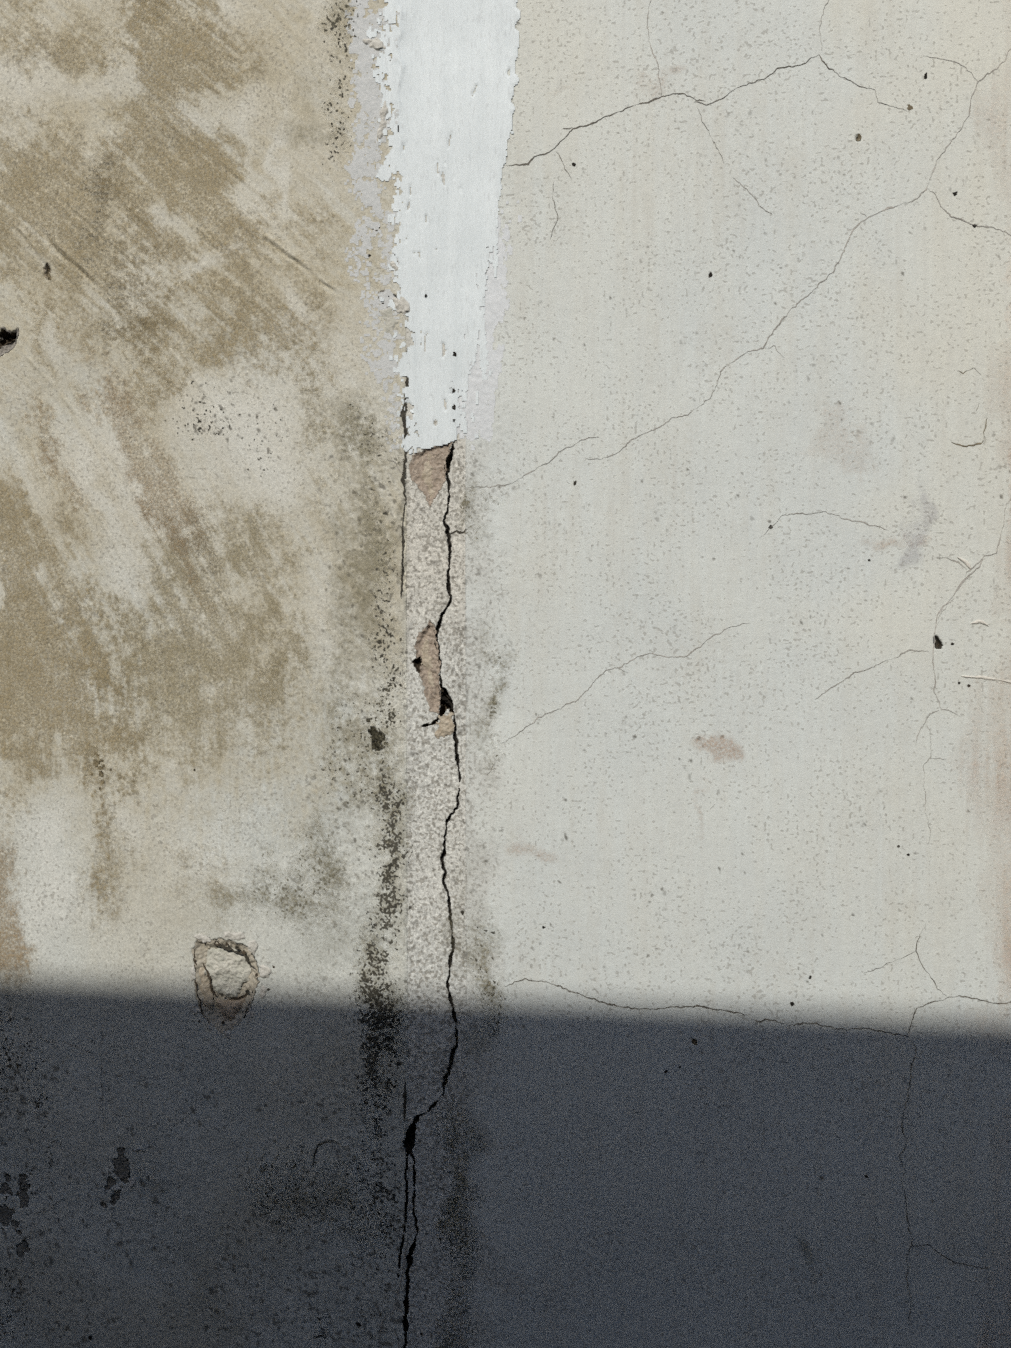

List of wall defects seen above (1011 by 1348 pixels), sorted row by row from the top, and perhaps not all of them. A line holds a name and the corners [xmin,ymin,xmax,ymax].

damp [0,1,260,288]
mould [322,0,358,165]
crack [506,0,905,236]
hole [0,327,19,356]
damp [159,373,281,470]
spalling [409,441,454,506]
damp [0,481,299,777]
spalling [412,620,455,739]
crack [379,49,1011,1348]
peeling [190,959,225,1025]
peeling [194,931,275,994]
damp [233,559,416,1348]